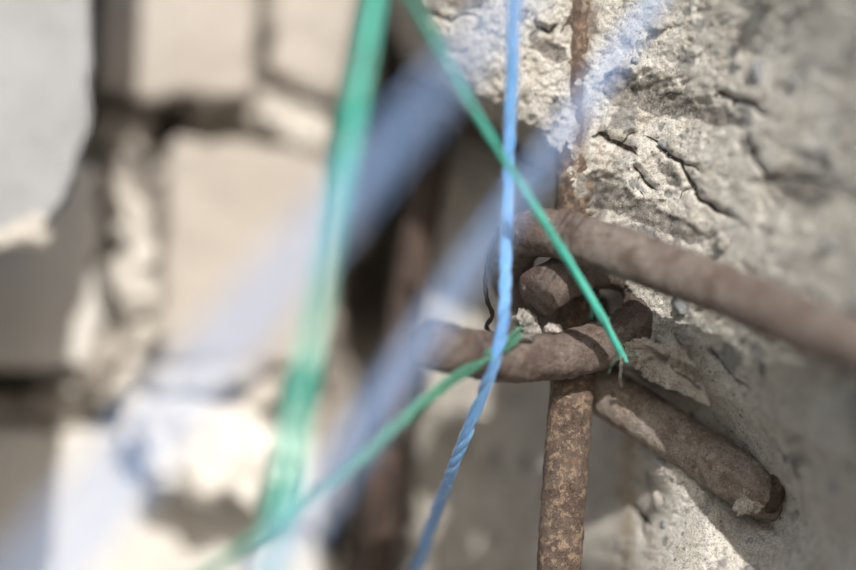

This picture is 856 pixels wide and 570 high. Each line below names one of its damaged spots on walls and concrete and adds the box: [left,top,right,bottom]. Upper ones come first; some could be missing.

crack [591,131,745,224]
spalling [370,0,856,570]
spalling [354,422,410,570]